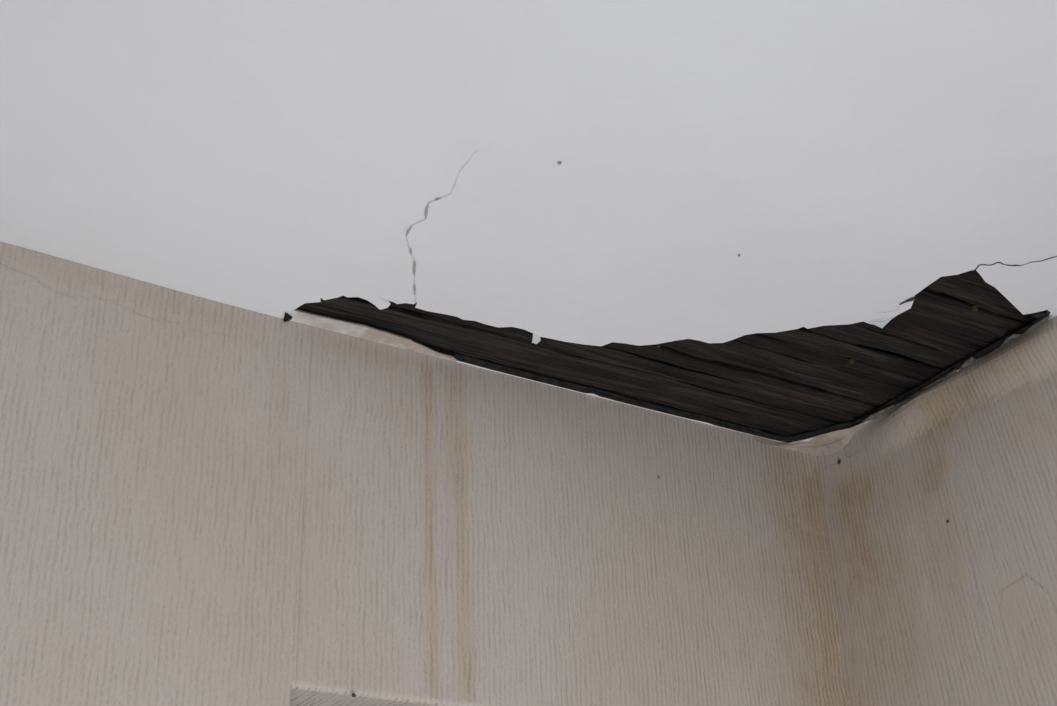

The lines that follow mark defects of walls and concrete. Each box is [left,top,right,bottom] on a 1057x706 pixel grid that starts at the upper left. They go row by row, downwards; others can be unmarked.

crack [405,150,478,303]
flaking render [869,316,896,328]
crack [974,256,1057,270]
water stain [0,242,483,703]
water stain [731,313,1057,706]